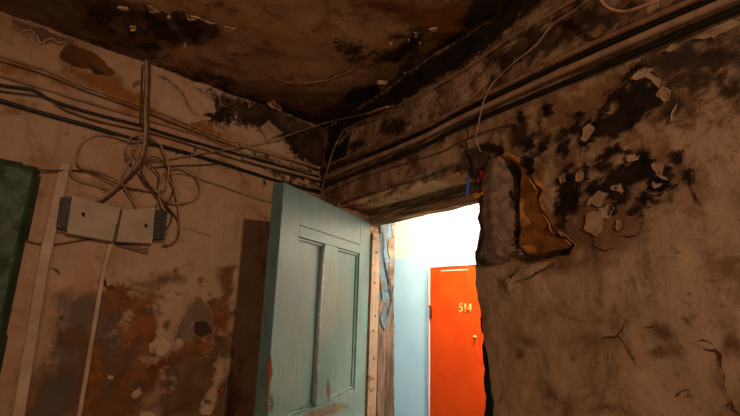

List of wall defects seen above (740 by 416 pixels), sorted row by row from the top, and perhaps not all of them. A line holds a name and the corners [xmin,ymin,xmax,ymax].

peeling [0,0,237,76]
peeling [693,19,740,39]
leakage [149,0,644,190]
peeling [580,124,595,142]
leakage [512,24,740,248]
peeling [631,64,678,123]
flaking render [462,142,581,266]
peeling [581,183,643,252]
peeling [650,162,668,189]
peeling [51,273,235,416]
crack [604,324,640,368]
crack [684,317,740,416]